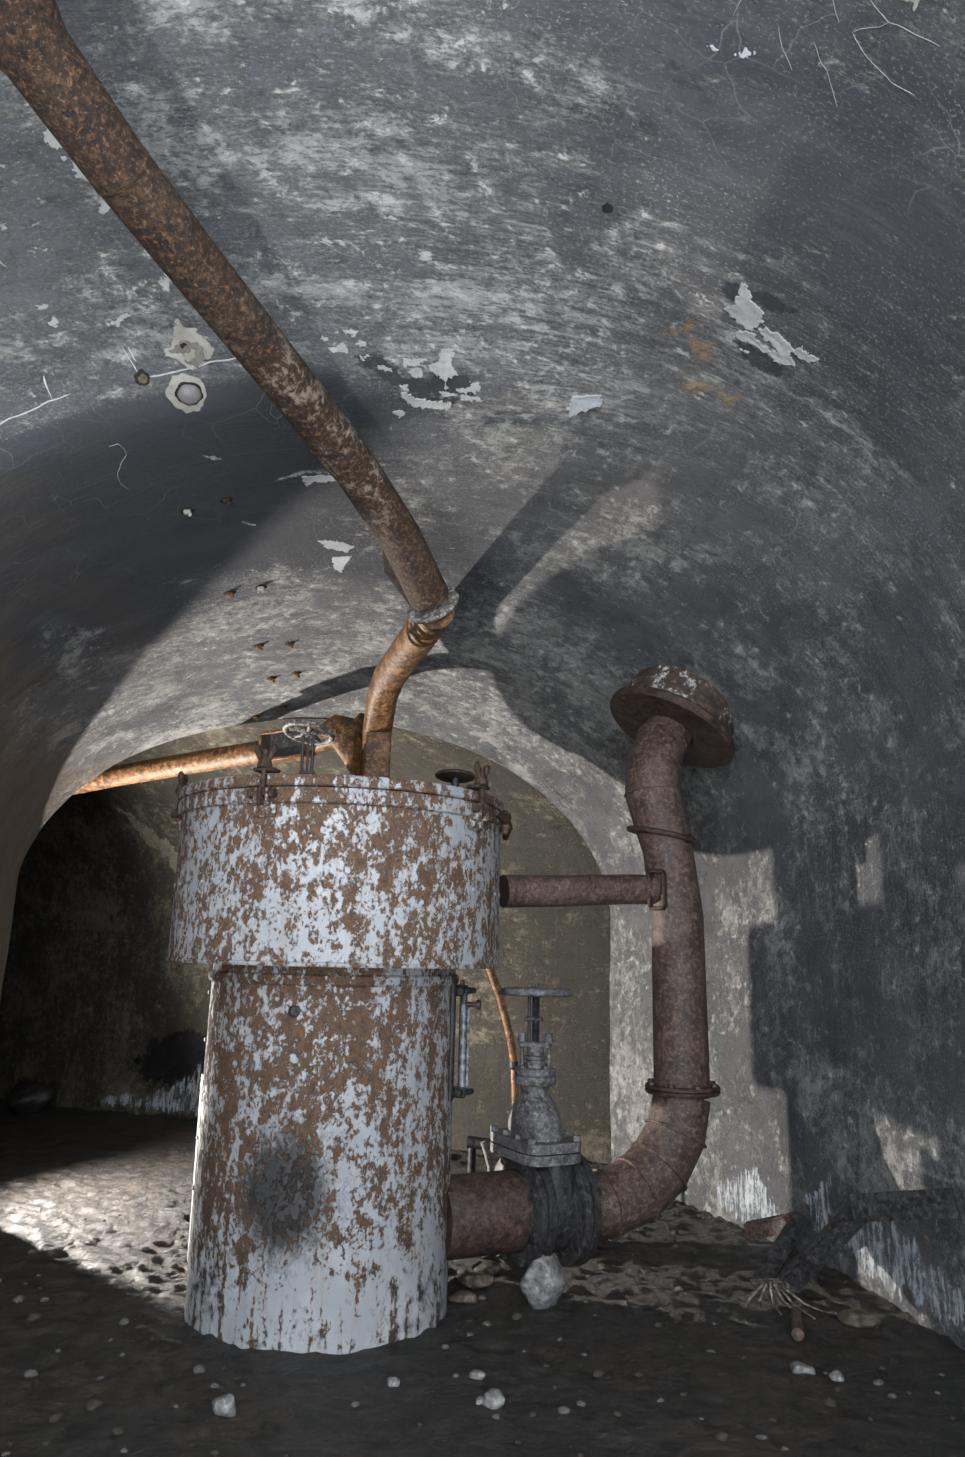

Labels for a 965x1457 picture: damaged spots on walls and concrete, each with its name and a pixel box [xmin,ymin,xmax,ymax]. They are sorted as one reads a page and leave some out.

crack [778,0,940,106]
peeling [38,128,89,182]
peeling [98,197,111,214]
spalling [164,318,215,370]
peeling [723,282,819,377]
peeling [321,329,483,418]
peeling [318,540,355,573]